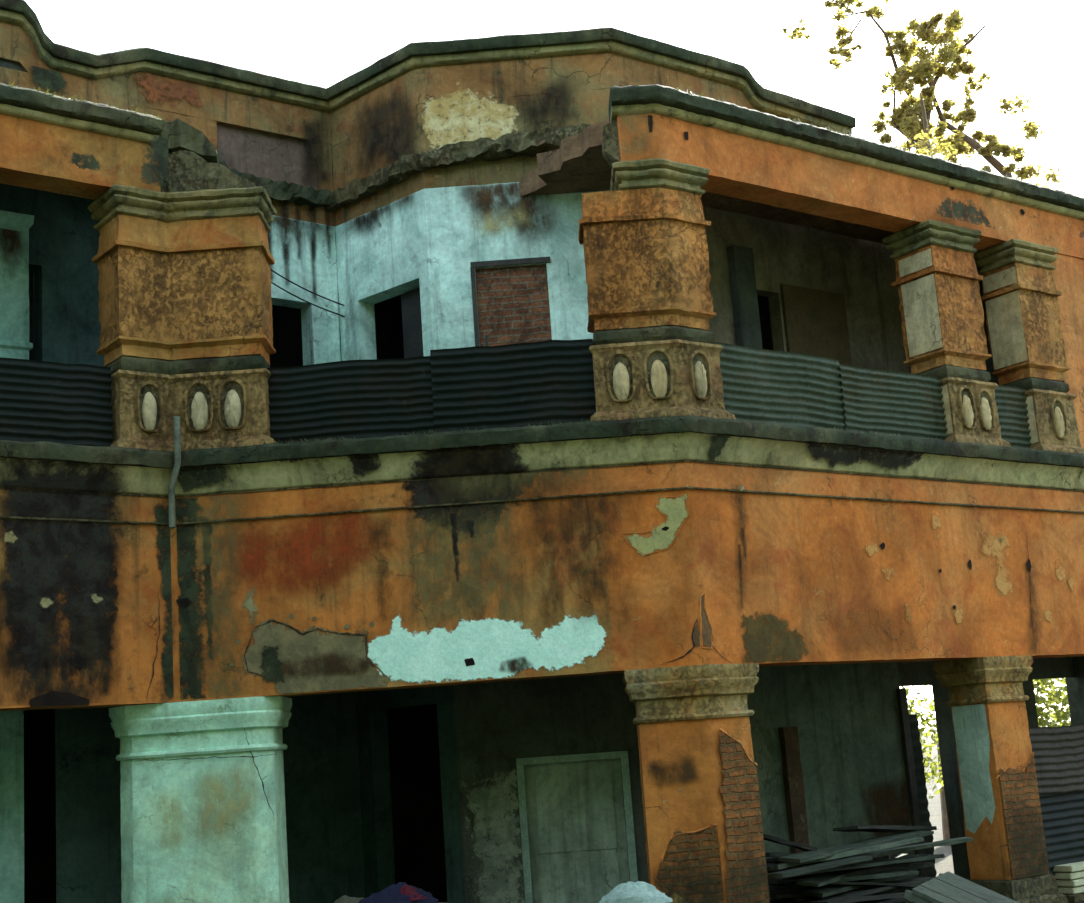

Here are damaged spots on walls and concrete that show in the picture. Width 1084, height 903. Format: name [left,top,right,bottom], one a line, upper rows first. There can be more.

peeling [422,83,520,149]
damp [267,202,331,298]
damp [806,442,925,470]
damp [0,457,125,701]
damp [402,443,585,619]
damp [564,495,615,606]
peeling [622,494,689,556]
spalling [229,614,389,694]
peeling [501,658,529,672]
damp [741,612,808,663]
spalling [655,728,770,903]
spalling [996,752,1049,879]